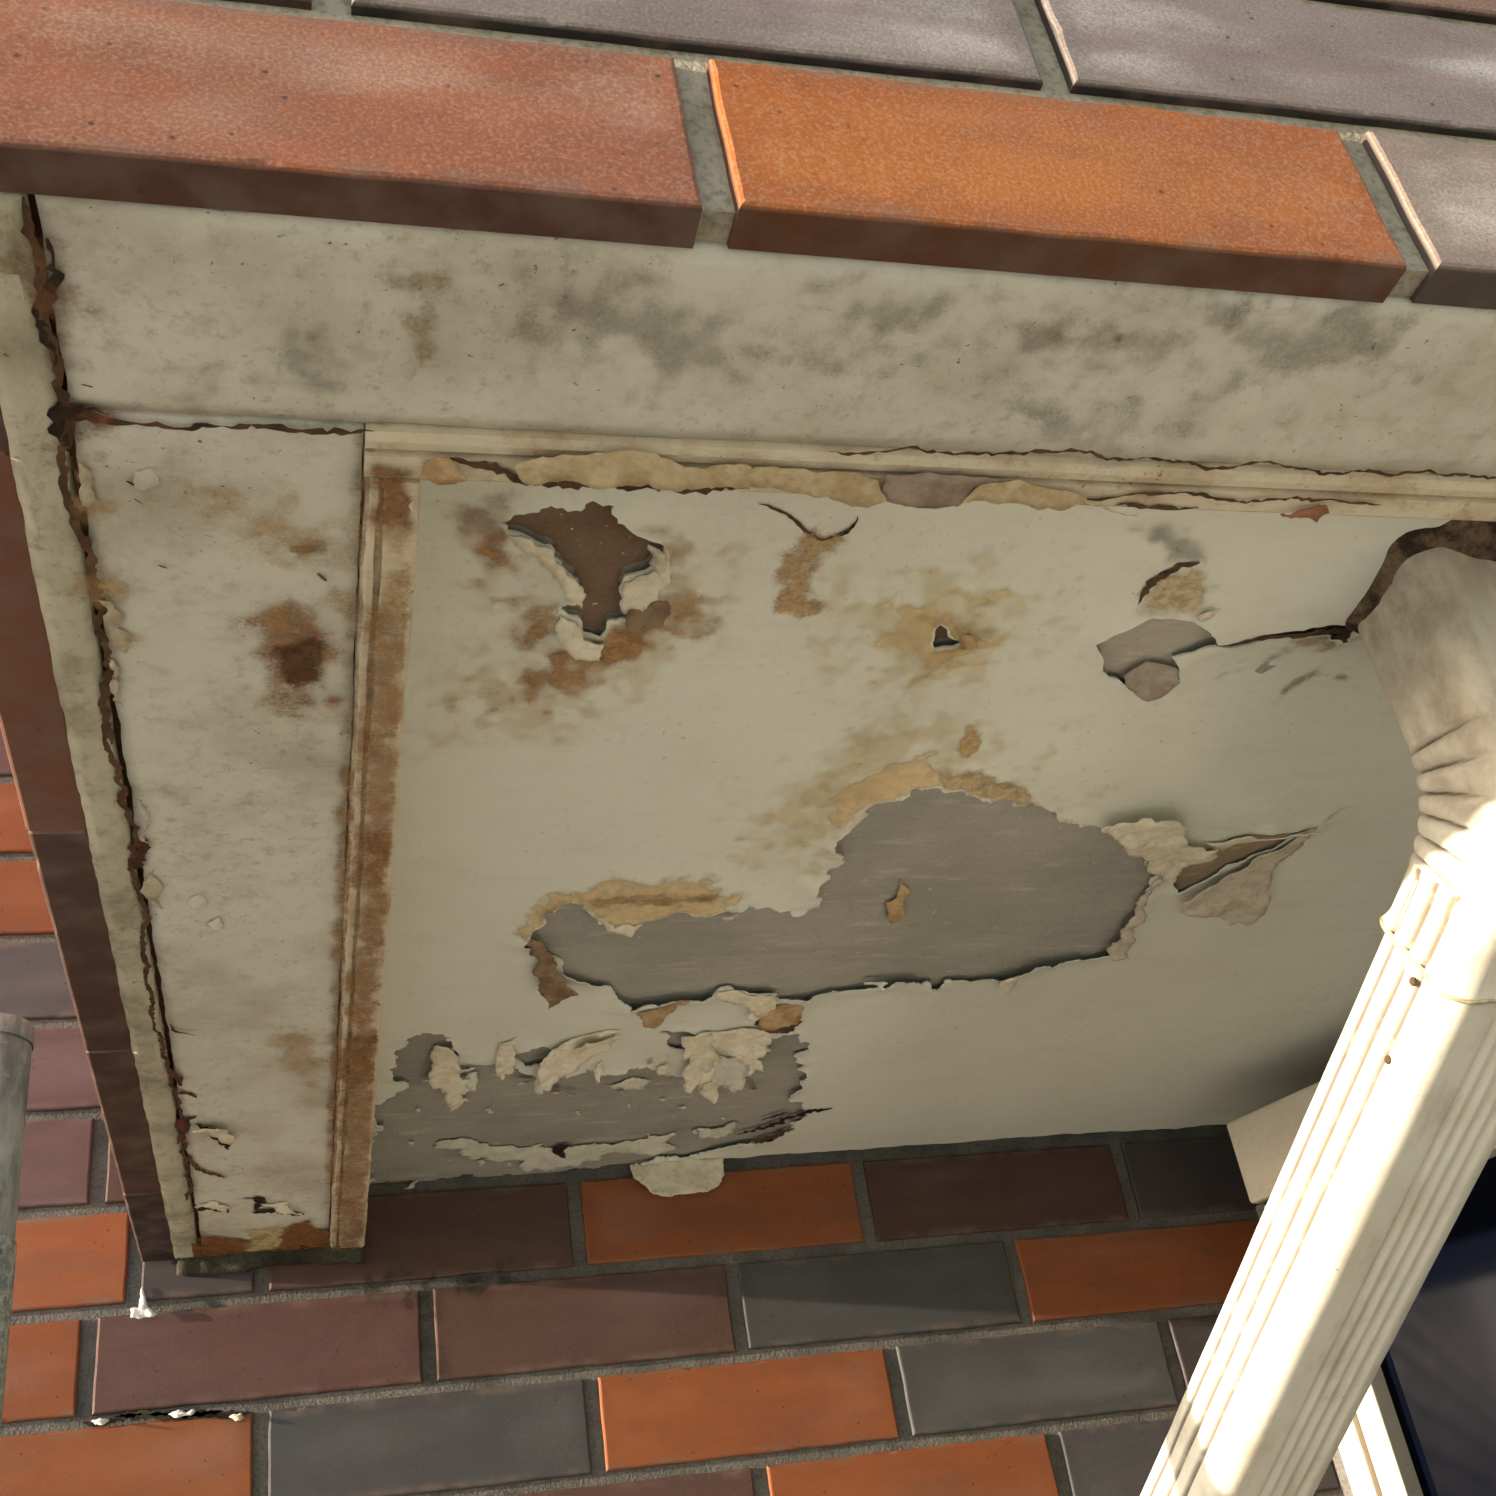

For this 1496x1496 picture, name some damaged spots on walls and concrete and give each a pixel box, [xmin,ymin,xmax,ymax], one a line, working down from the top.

corrosion [253,518,325,554]
corrosion [356,467,412,550]
peeling [417,449,1198,661]
crack [760,504,858,541]
crack [829,446,1496,614]
spalling [1280,505,1330,523]
crack [20,196,374,1216]
peeling [1098,609,1220,702]
crack [1238,626,1353,645]
leakage [828,725,1034,828]
corrosion [191,575,410,1257]
peeling [370,788,1353,1197]